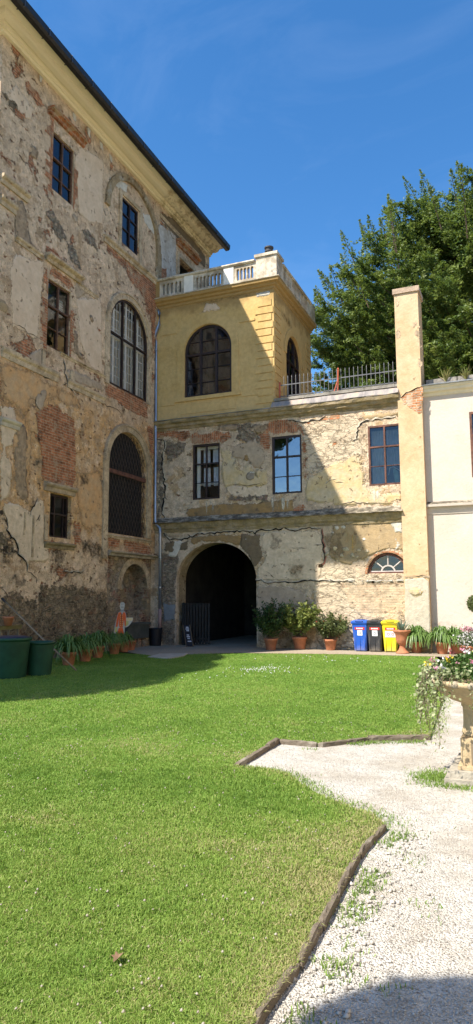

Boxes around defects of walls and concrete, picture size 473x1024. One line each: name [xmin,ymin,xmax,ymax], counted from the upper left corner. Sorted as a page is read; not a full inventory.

flaking render [0,147,206,373]
crack [5,498,40,583]
flaking render [0,390,103,564]
crack [157,439,354,585]
flaking render [186,387,423,516]
crack [353,386,421,441]
flaking render [0,584,108,658]